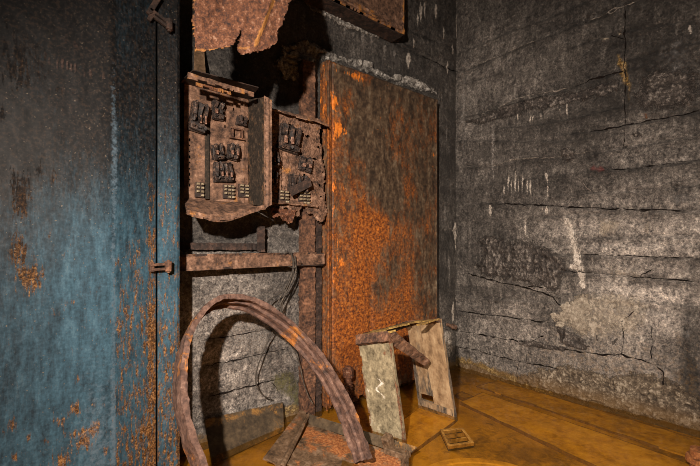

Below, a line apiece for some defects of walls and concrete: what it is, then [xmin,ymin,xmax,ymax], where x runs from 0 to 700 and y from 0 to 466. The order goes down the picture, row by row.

spalling [276,39,437,95]
crack [459,2,699,146]
crack [612,160,695,170]
crack [489,177,681,212]
leakage [564,218,585,289]
crack [466,273,561,306]
crack [207,349,284,366]
crack [460,311,558,378]
crack [564,311,664,385]
crack [211,378,283,396]